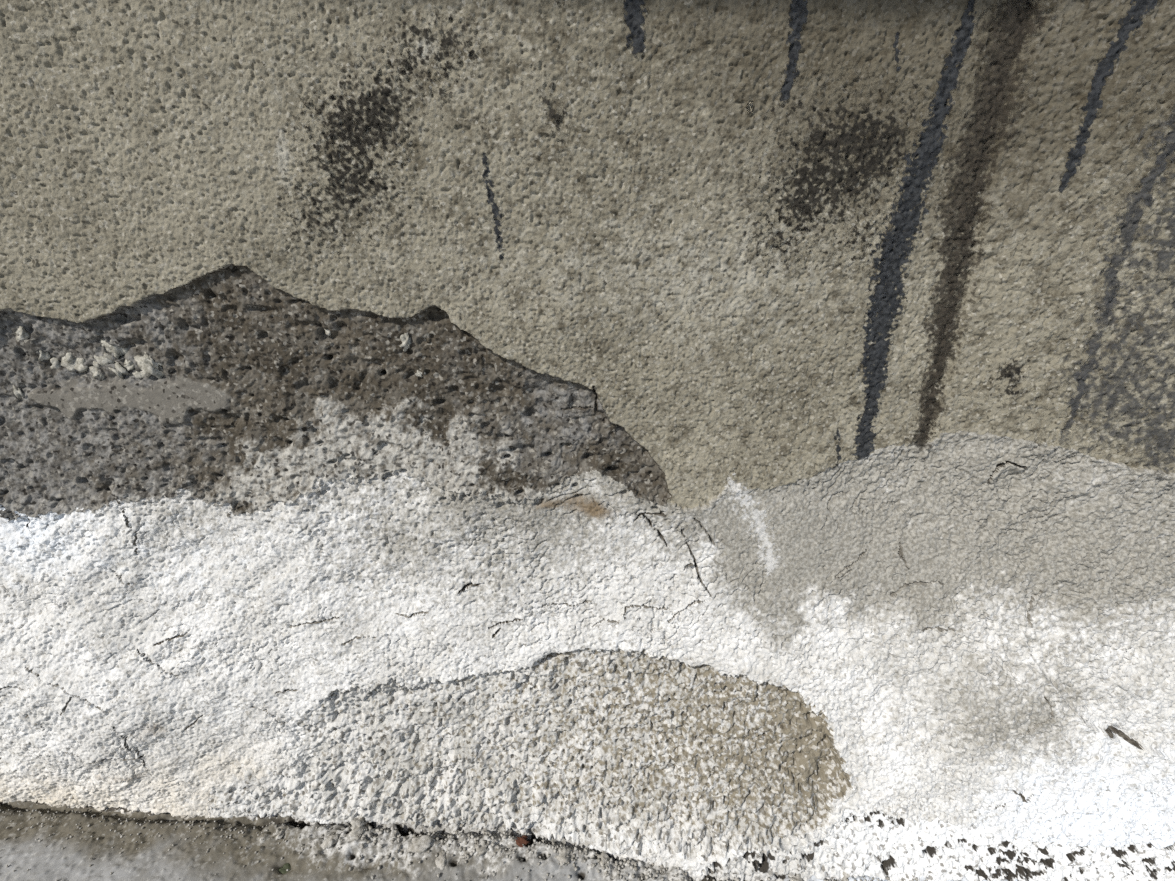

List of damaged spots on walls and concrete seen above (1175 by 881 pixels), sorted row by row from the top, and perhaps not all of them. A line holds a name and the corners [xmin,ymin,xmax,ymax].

leakage [276,11,487,261]
leakage [482,153,504,260]
leakage [743,0,1052,468]
leakage [1059,0,1158,192]
leakage [1061,111,1175,487]
crack [290,615,376,646]
crack [396,610,428,618]
peeling [0,264,1175,881]
crack [488,511,716,637]